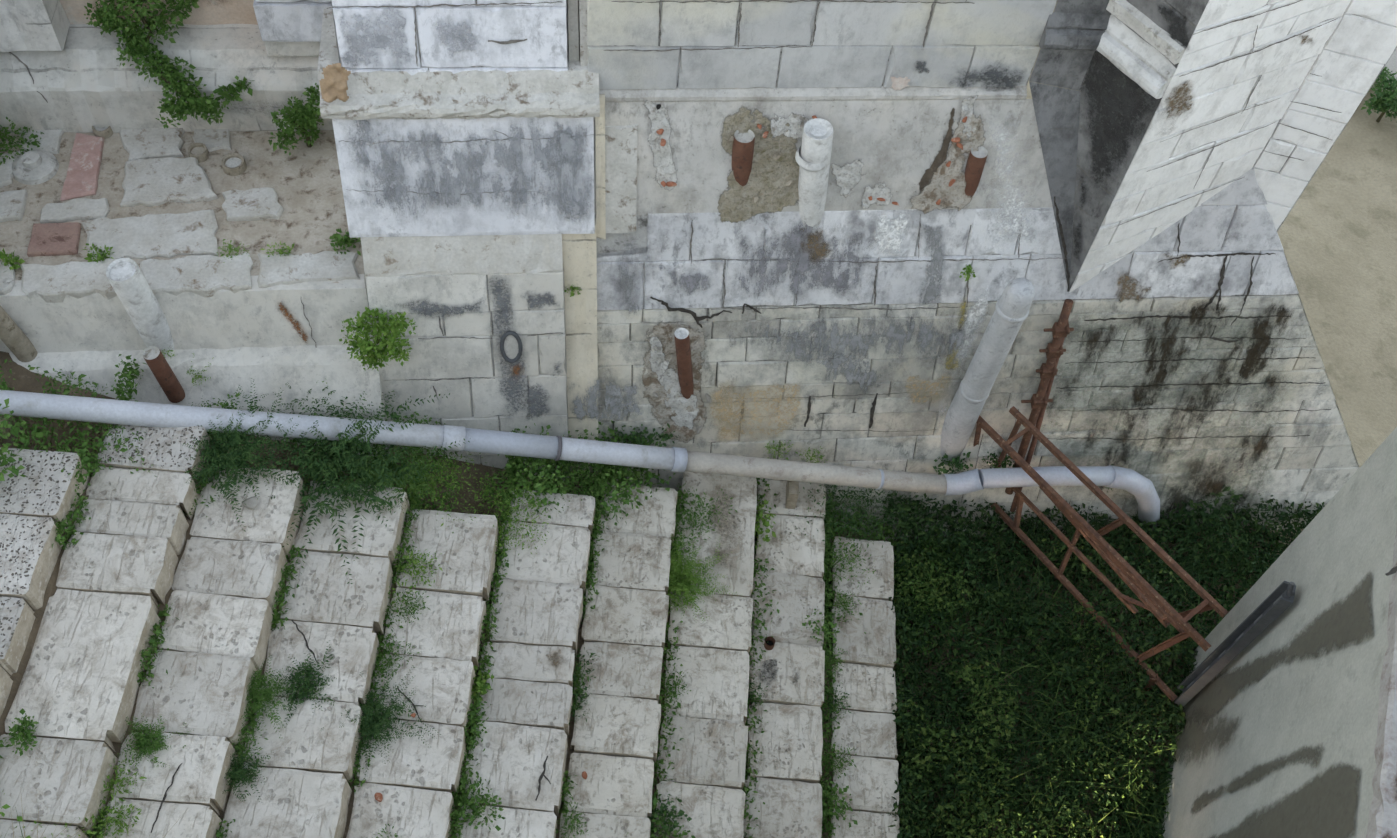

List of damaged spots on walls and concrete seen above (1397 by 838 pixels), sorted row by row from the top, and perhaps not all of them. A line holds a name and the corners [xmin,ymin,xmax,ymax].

damp [352,120,591,220]
spalling [644,100,677,190]
spalling [718,107,817,223]
spalling [832,95,985,214]
damp [403,278,560,419]
spalling [642,322,712,443]
crack [650,297,761,328]
damp [738,213,909,296]
damp [729,297,987,402]
damp [1087,302,1226,466]
damp [1158,305,1292,458]
crack [1205,256,1254,343]